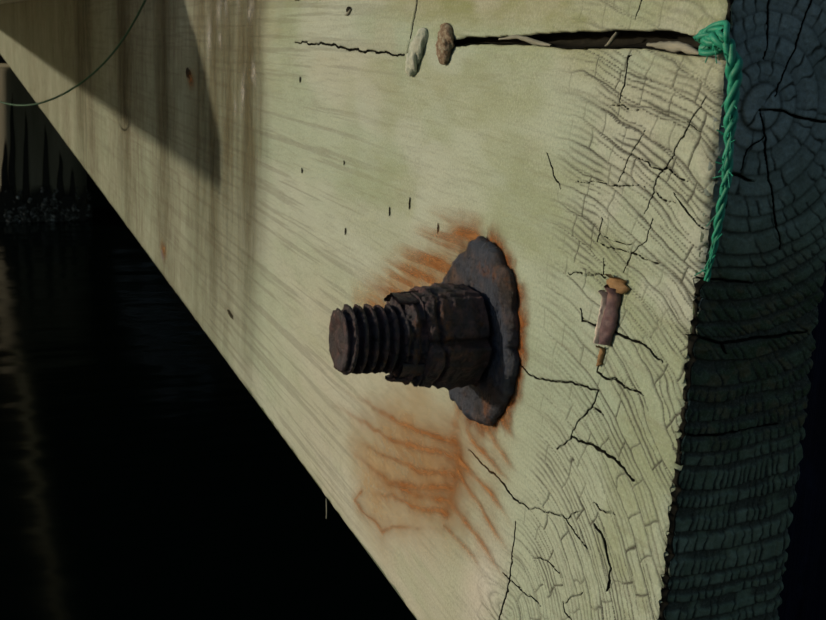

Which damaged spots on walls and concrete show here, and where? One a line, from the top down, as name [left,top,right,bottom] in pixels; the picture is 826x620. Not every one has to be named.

water stain [218,0,260,177]
crack [295,0,418,57]
crack [454,0,715,111]
crack [546,95,711,280]
crack [725,0,826,250]
rust [368,252,452,308]
rust [354,411,497,553]
rust [466,282,527,467]
crack [469,449,616,620]
crack [520,364,644,482]
crack [579,308,663,363]
crack [658,276,808,620]